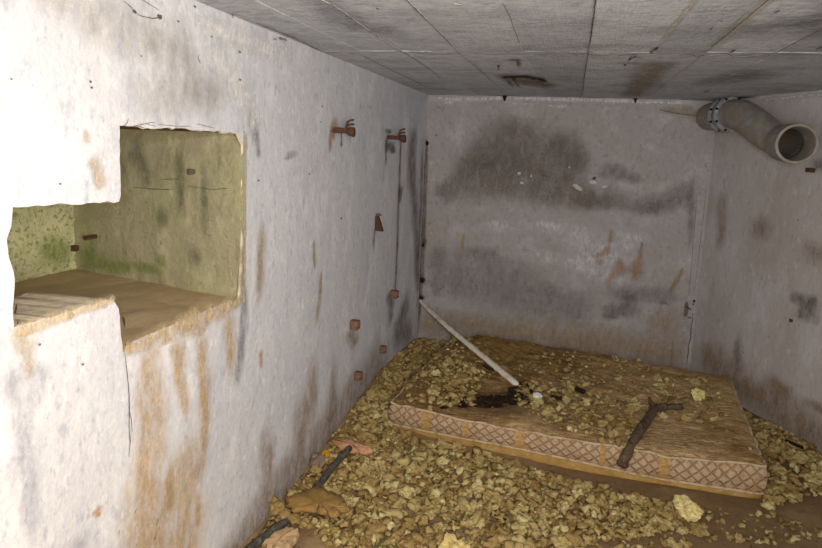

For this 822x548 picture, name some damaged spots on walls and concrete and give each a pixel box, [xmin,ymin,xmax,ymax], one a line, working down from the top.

water stain [456,126,615,207]
water stain [227,293,246,363]
crack [124,355,132,453]
water stain [200,347,208,446]
water stain [138,449,160,548]